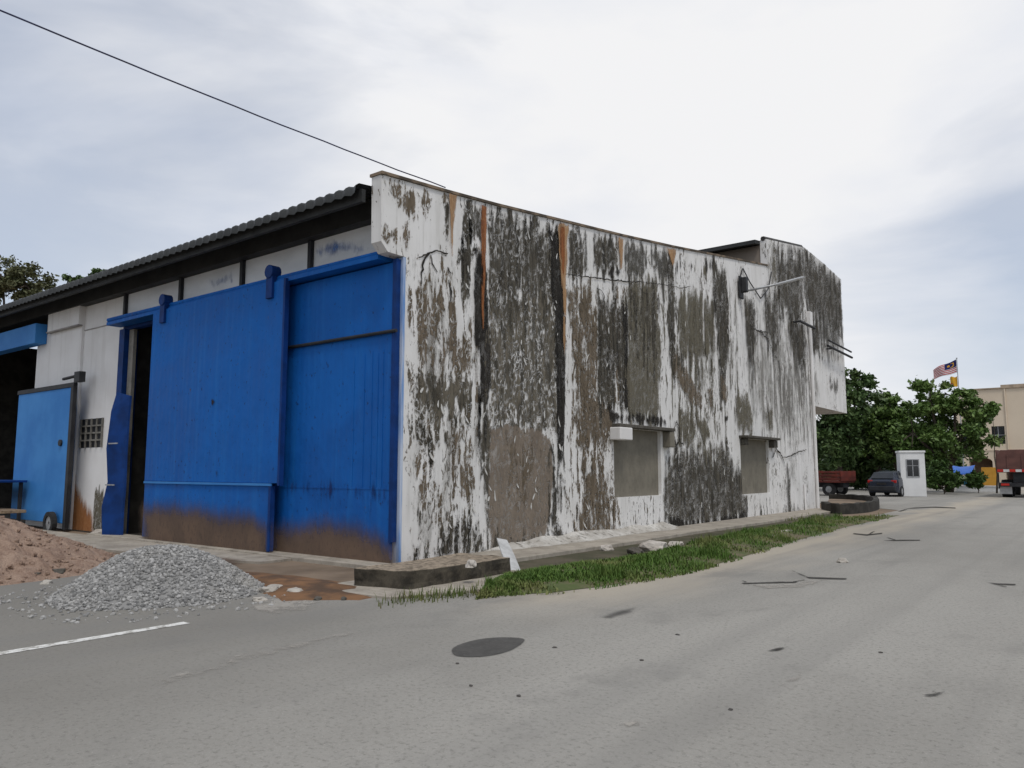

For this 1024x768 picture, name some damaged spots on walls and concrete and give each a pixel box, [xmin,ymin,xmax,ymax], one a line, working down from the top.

peeling [383,179,449,248]
rust [449,193,457,256]
crack [419,250,452,301]
rust [558,223,569,351]
damp [445,198,579,550]
peeling [406,237,631,560]
peeling [639,247,773,453]
damp [597,242,844,450]
rust [72,483,92,531]
rust [142,508,395,564]
mould [660,434,765,526]